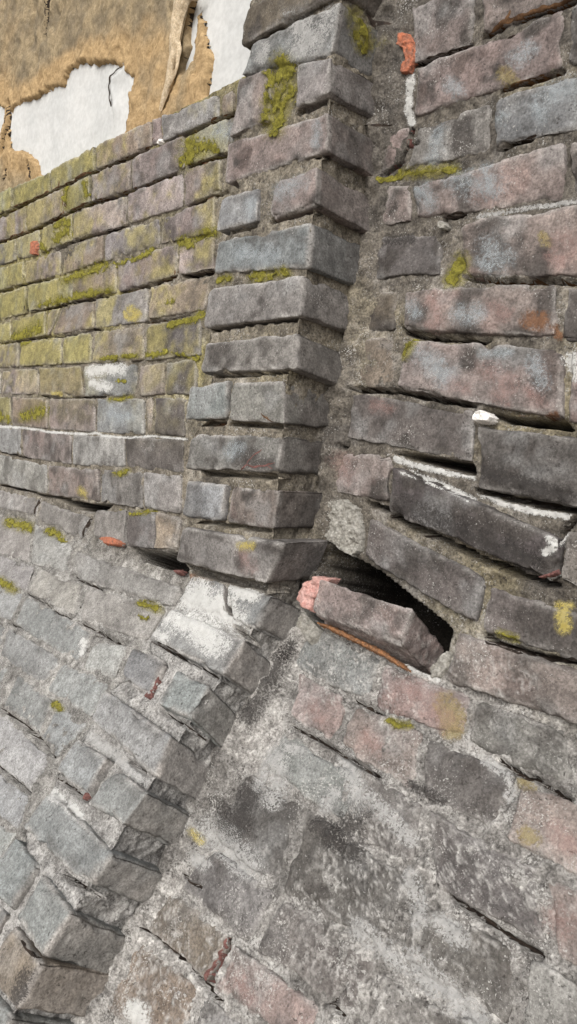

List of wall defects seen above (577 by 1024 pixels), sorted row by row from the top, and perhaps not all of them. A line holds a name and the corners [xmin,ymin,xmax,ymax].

flaking render [0,63,134,175]
crack [108,66,130,121]
flaking render [200,0,252,95]
spalling [296,576,411,673]